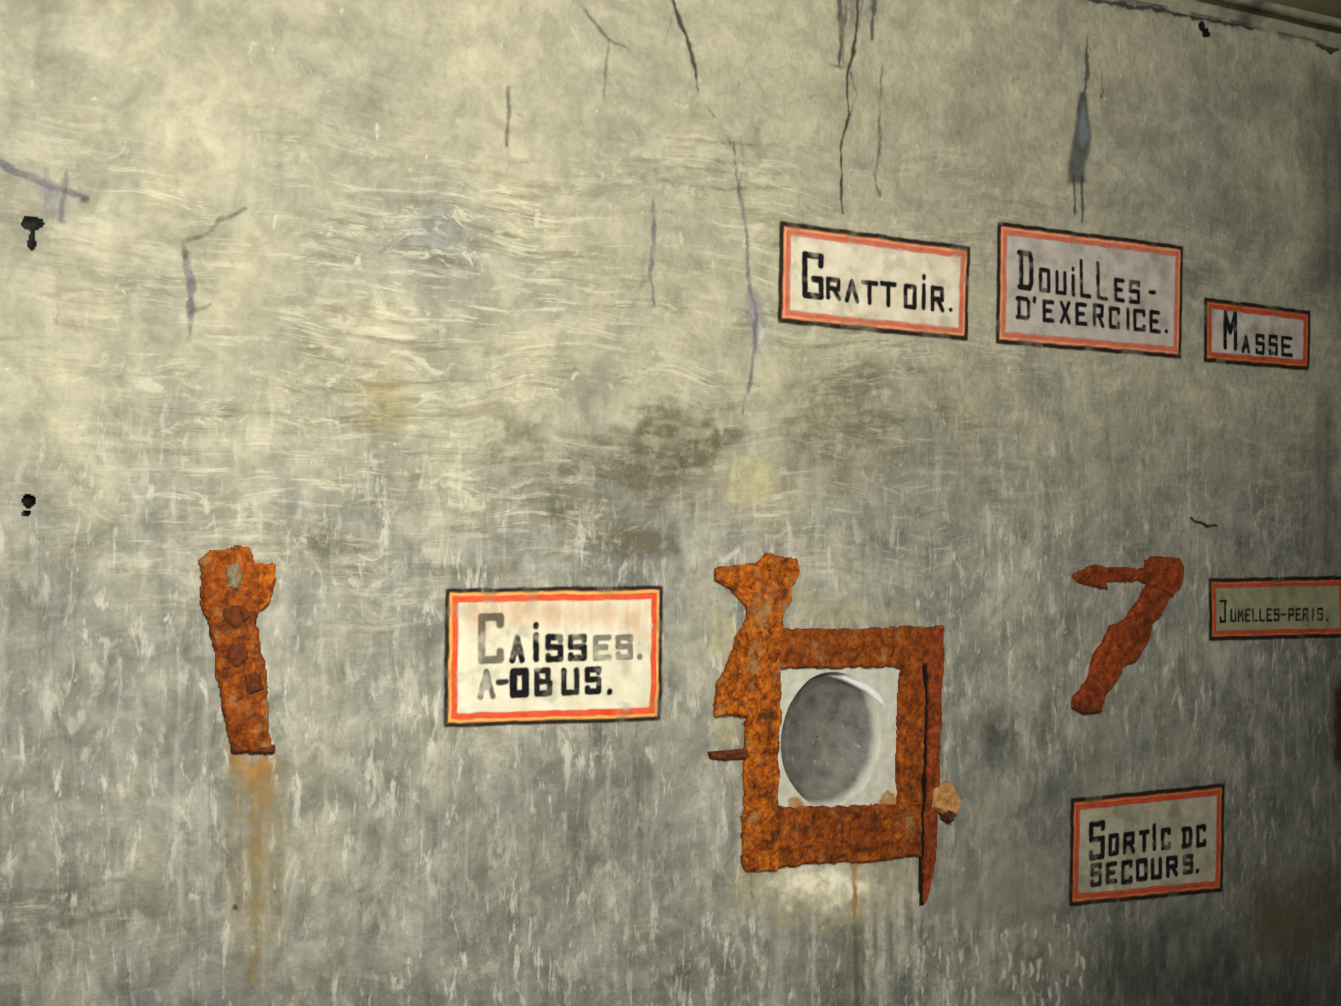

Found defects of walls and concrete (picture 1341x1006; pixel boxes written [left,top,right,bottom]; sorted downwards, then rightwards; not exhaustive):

crack [0,160,86,216]
crack [672,0,698,88]
crack [840,0,882,214]
leakage [1070,48,1102,222]
crack [747,235,765,386]
rust [880,791,896,805]